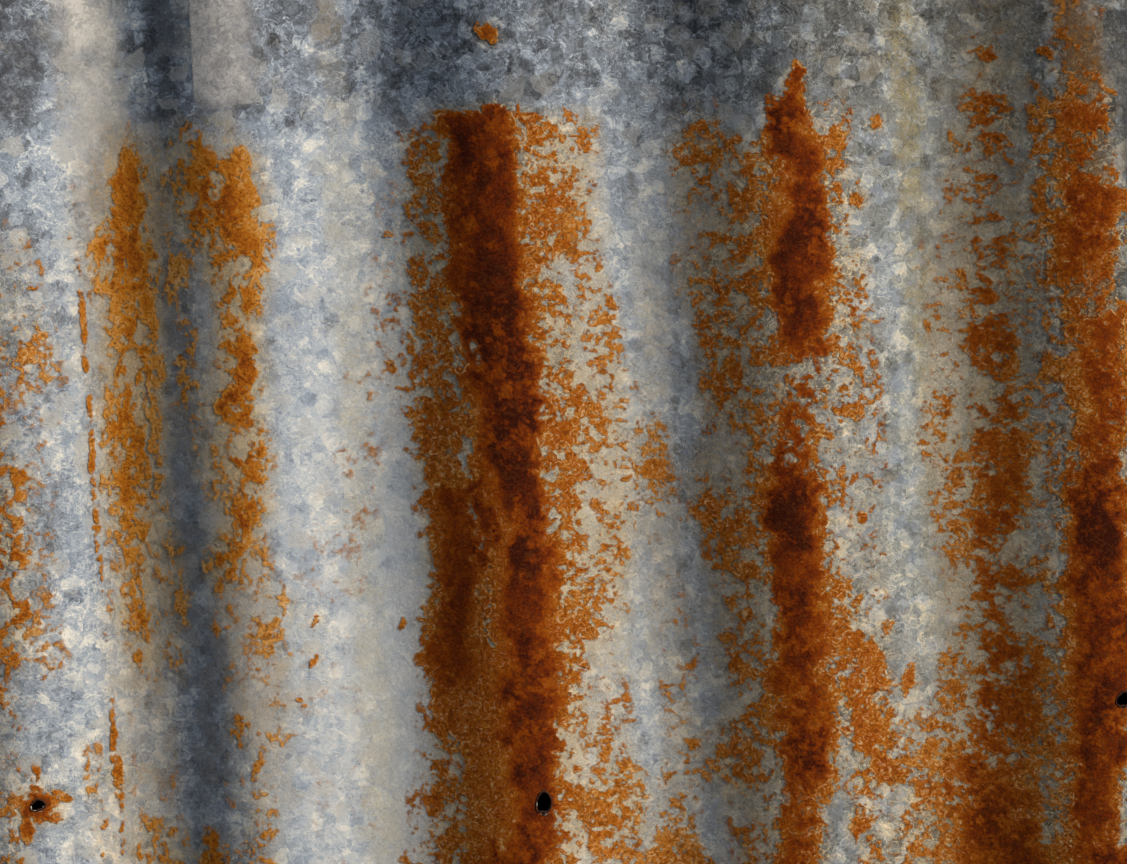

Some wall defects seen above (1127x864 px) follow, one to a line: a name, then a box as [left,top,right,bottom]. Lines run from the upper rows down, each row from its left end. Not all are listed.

rust [7,239,44,291]
rust [0,314,69,428]
rust [75,122,307,708]
rust [340,0,1127,864]
rust [0,440,71,731]
rust [83,698,295,864]